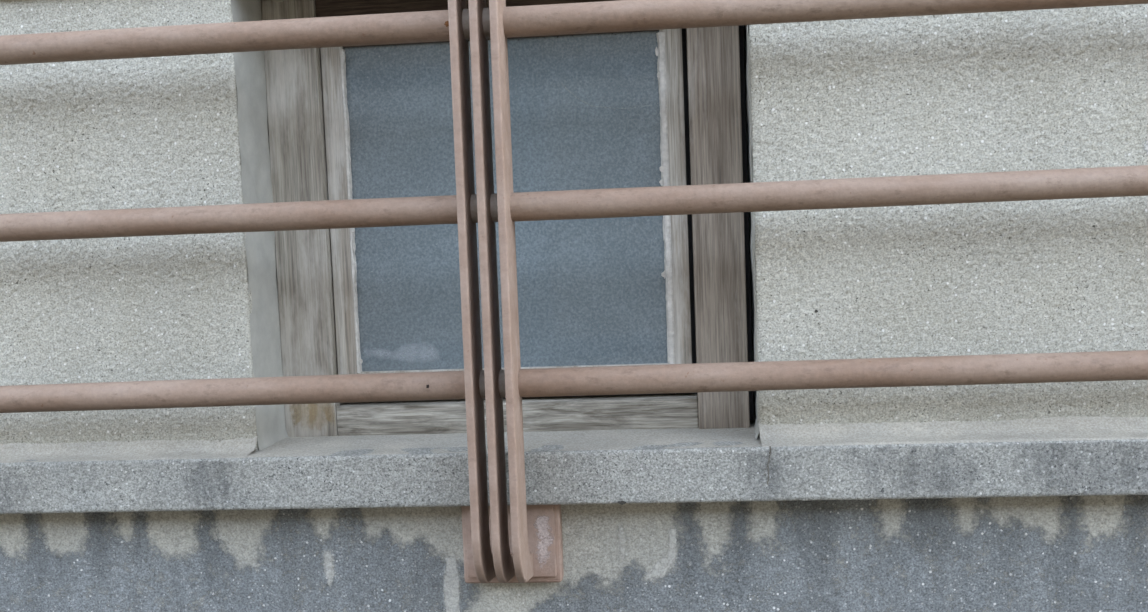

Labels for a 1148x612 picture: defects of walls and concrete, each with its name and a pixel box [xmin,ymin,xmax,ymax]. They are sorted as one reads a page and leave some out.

water stain [0,508,479,612]
water stain [531,495,1148,612]